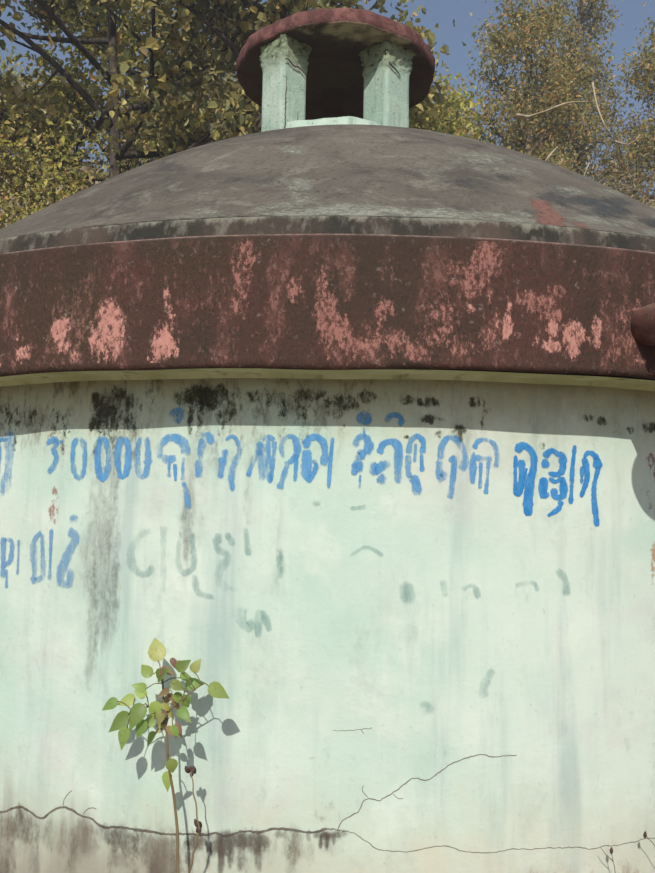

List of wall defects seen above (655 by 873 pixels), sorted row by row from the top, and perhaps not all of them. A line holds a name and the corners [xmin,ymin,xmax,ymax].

peeling [449,241,502,312]
peeling [15,337,31,364]
peeling [46,317,78,363]
peeling [88,297,126,364]
peeling [147,288,179,363]
peeling [314,266,655,375]
leakage [89,385,142,448]
leakage [175,383,237,432]
leakage [248,390,377,420]
leakage [403,396,440,437]
crack [0,754,654,853]
leakage [187,832,267,872]